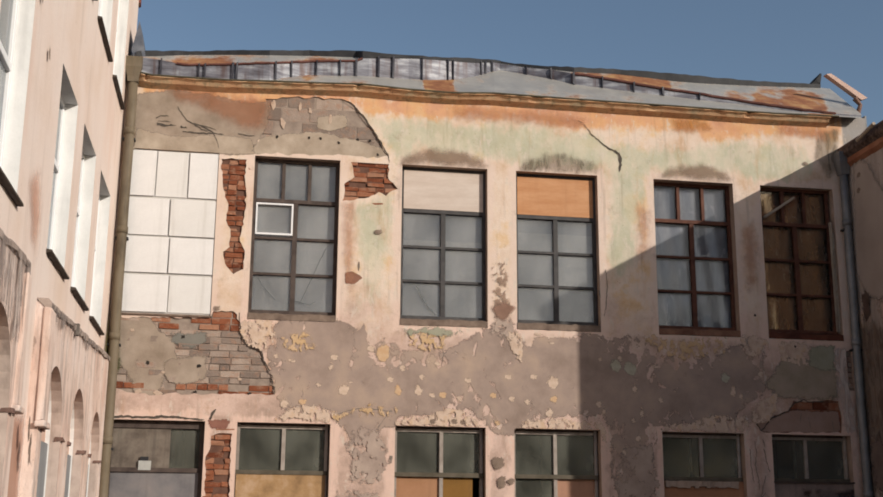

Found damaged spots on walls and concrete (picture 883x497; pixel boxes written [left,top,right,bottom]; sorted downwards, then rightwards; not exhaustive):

rust [575,73,836,115]
crack [156,107,254,148]
flaking render [133,90,397,274]
damp [402,150,482,166]
damp [522,155,584,171]
crack [579,121,622,172]
damp [665,165,728,179]
damp [0,235,31,339]
peeling [116,262,842,497]
peeling [809,345,854,391]